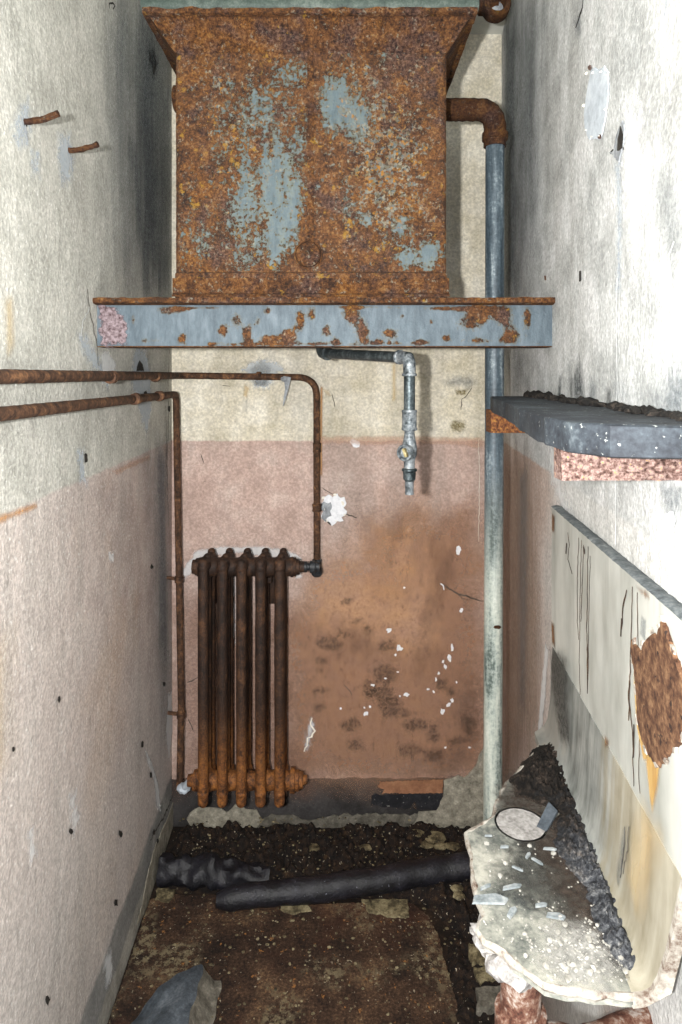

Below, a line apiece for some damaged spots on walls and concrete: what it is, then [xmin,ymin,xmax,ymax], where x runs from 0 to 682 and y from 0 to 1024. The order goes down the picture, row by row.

peeling [582,65,609,140]
peeling [98,305,128,371]
spalling [321,488,357,526]